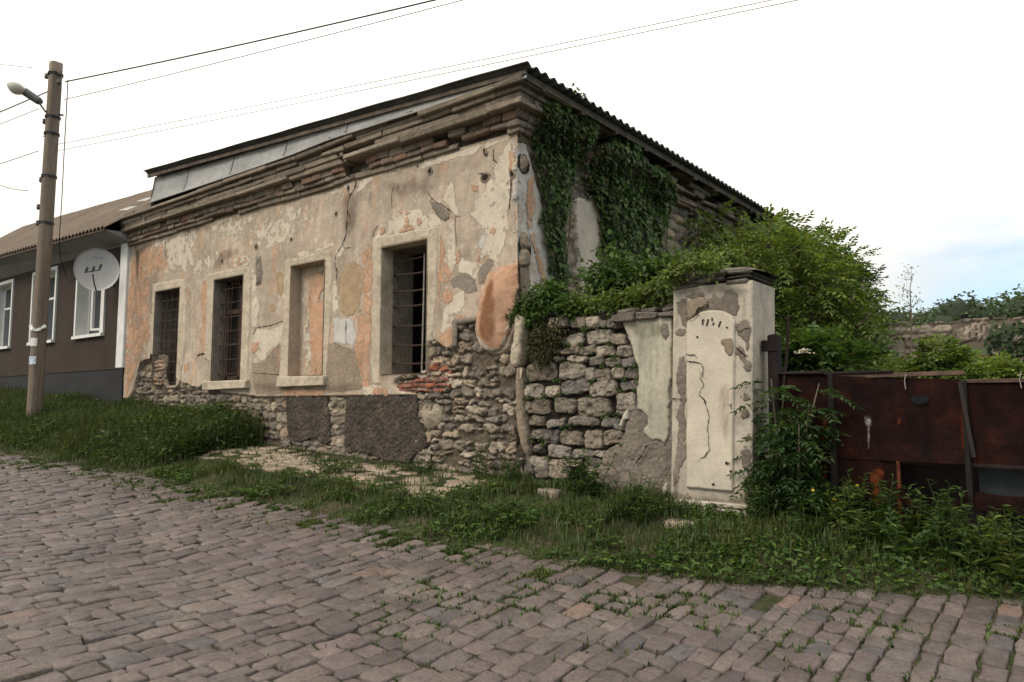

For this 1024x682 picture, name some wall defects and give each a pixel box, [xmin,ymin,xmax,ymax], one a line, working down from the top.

crack [329,137,356,278]
spalling [124,137,561,476]
peeling [572,195,607,297]
peeling [597,288,752,494]
crack [672,354,710,459]
rust [870,469,886,514]